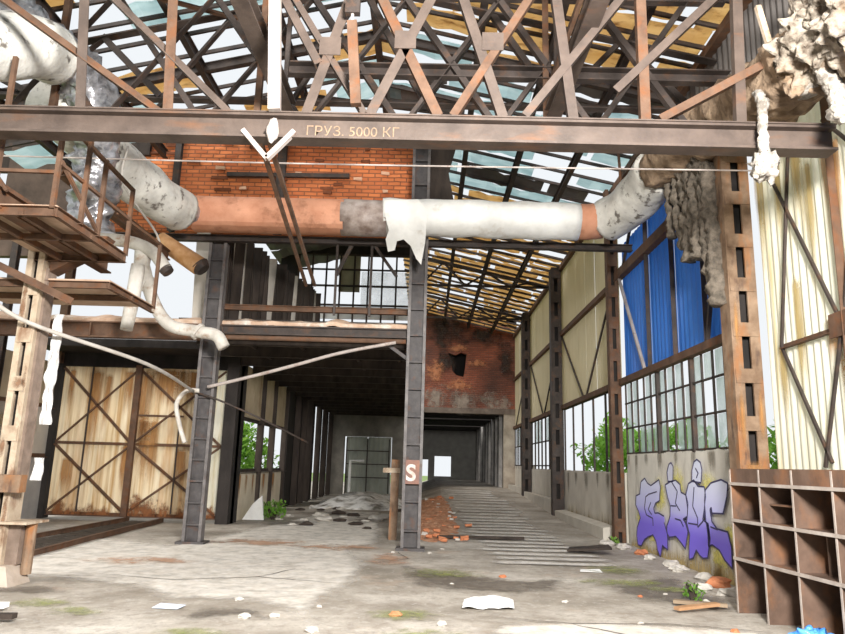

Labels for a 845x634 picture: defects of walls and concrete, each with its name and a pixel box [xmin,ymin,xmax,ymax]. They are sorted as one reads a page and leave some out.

water stain [754,180,765,227]
water stain [790,158,815,249]
water stain [793,281,805,370]
rust [88,372,112,421]
rust [125,370,197,467]
flaking render [426,363,509,414]
water stain [779,347,788,396]
rust [60,460,72,483]
rust [176,451,185,475]
rust [51,495,184,518]